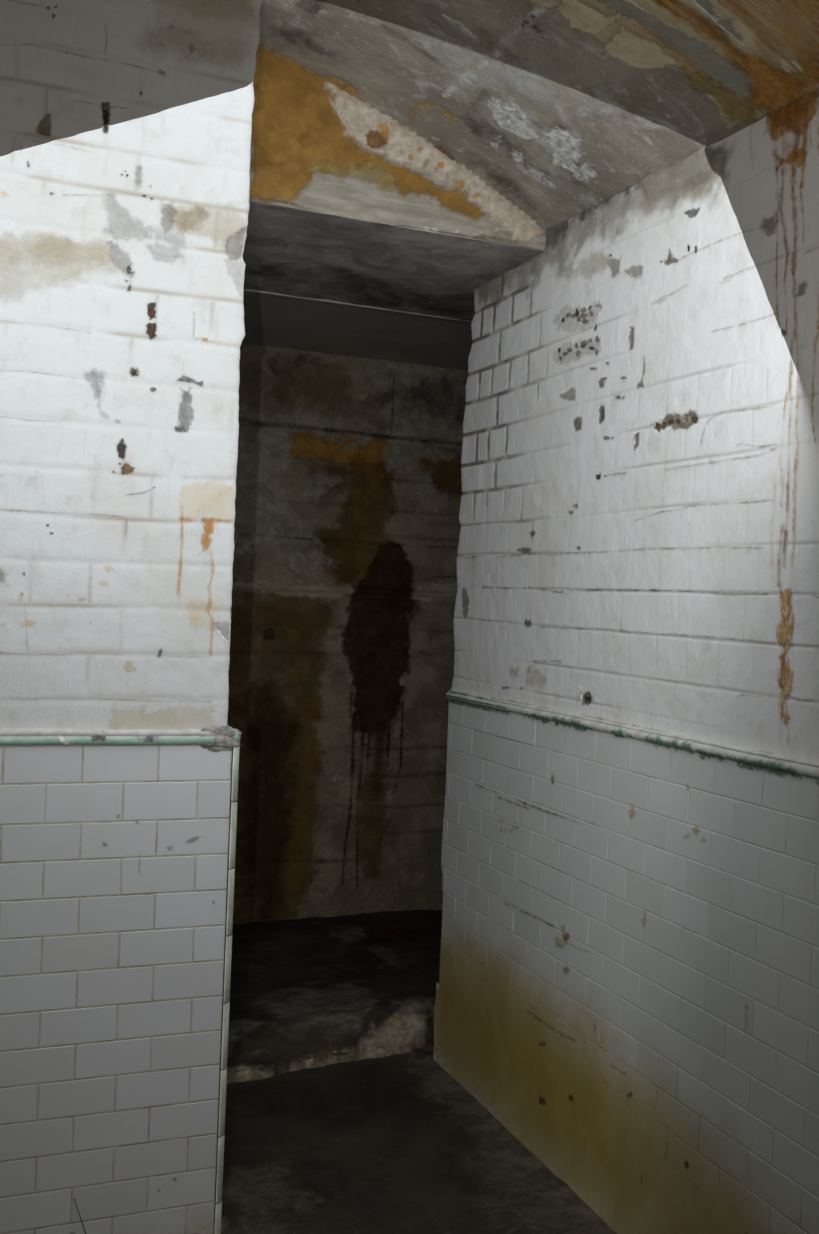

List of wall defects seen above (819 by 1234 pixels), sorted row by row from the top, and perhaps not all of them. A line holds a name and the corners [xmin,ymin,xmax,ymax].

peeling [530,0,819,129]
corrosion [249,45,484,219]
spalling [225,226,247,295]
damp [477,188,630,304]
corrosion [776,238,796,296]
spalling [175,375,203,432]
damp [234,360,466,575]
spalling [653,410,698,432]
corrosion [201,519,222,550]
corrosion [227,590,331,922]
damp [341,542,414,882]
damp [437,966,744,1234]